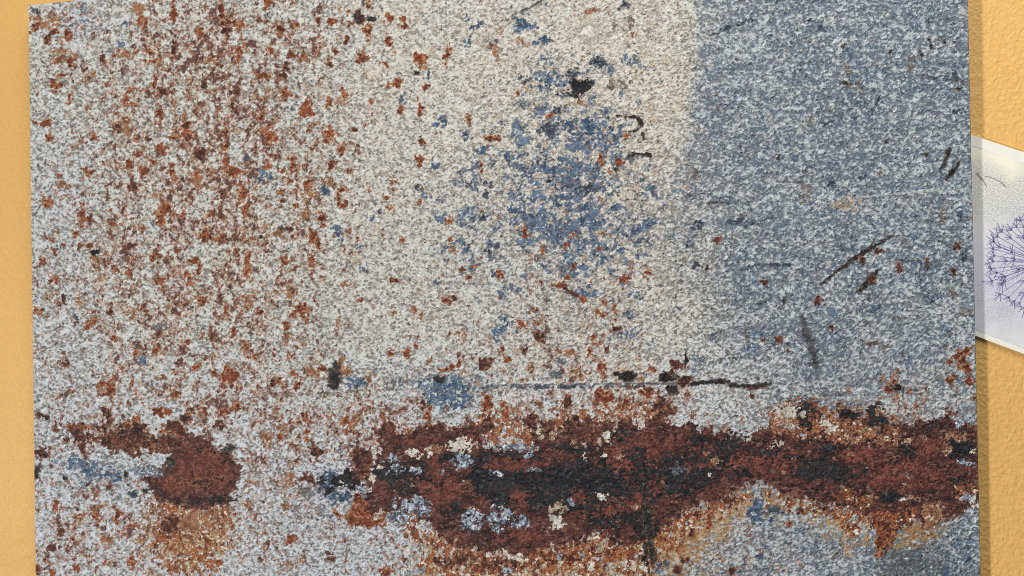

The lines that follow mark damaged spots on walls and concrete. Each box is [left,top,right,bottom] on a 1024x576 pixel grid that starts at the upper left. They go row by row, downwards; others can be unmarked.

rust [29,10,94,116]
rust [31,119,54,142]
rust [90,0,249,230]
rust [193,0,408,392]
rust [38,202,94,263]
rust [33,276,83,318]
rust [83,303,148,331]
rust [134,303,174,358]
rust [174,249,207,308]
rust [184,326,215,345]
rust [325,260,979,576]
rust [34,355,254,576]